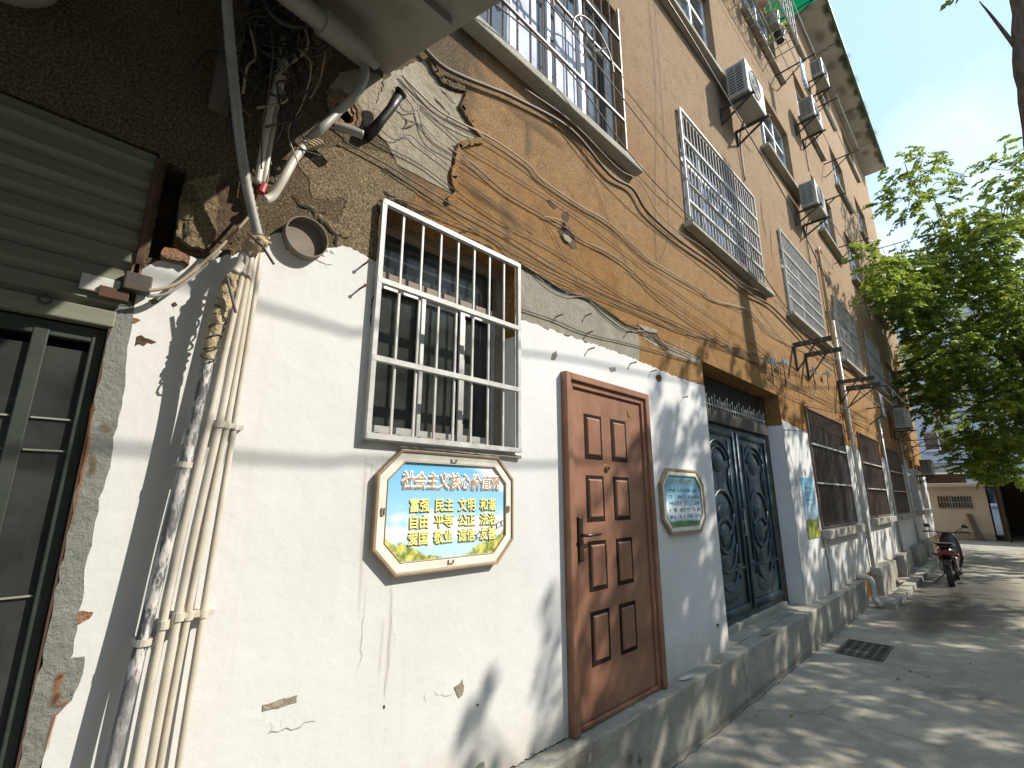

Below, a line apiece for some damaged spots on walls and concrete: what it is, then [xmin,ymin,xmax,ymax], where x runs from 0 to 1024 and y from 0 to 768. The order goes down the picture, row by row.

peeling [291,57,483,259]
spalling [131,173,243,274]
peeling [520,262,700,364]
spalling [135,335,156,346]
spalling [77,611,93,624]
spalling [454,679,464,698]
spalling [262,695,297,711]